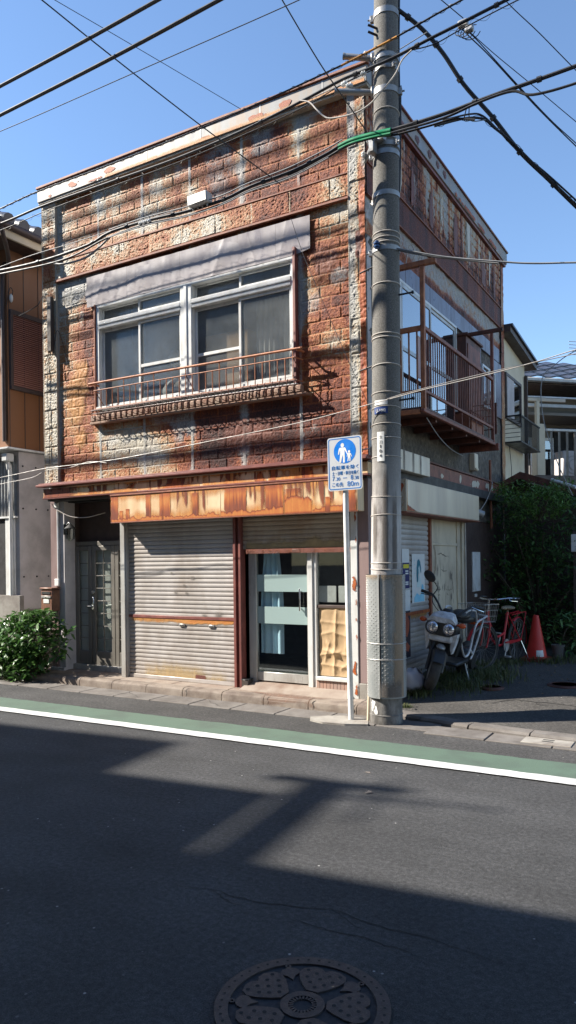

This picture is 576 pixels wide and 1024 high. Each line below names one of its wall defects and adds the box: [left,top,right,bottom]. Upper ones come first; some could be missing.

rust [105,77,364,177]
rust [43,465,356,522]